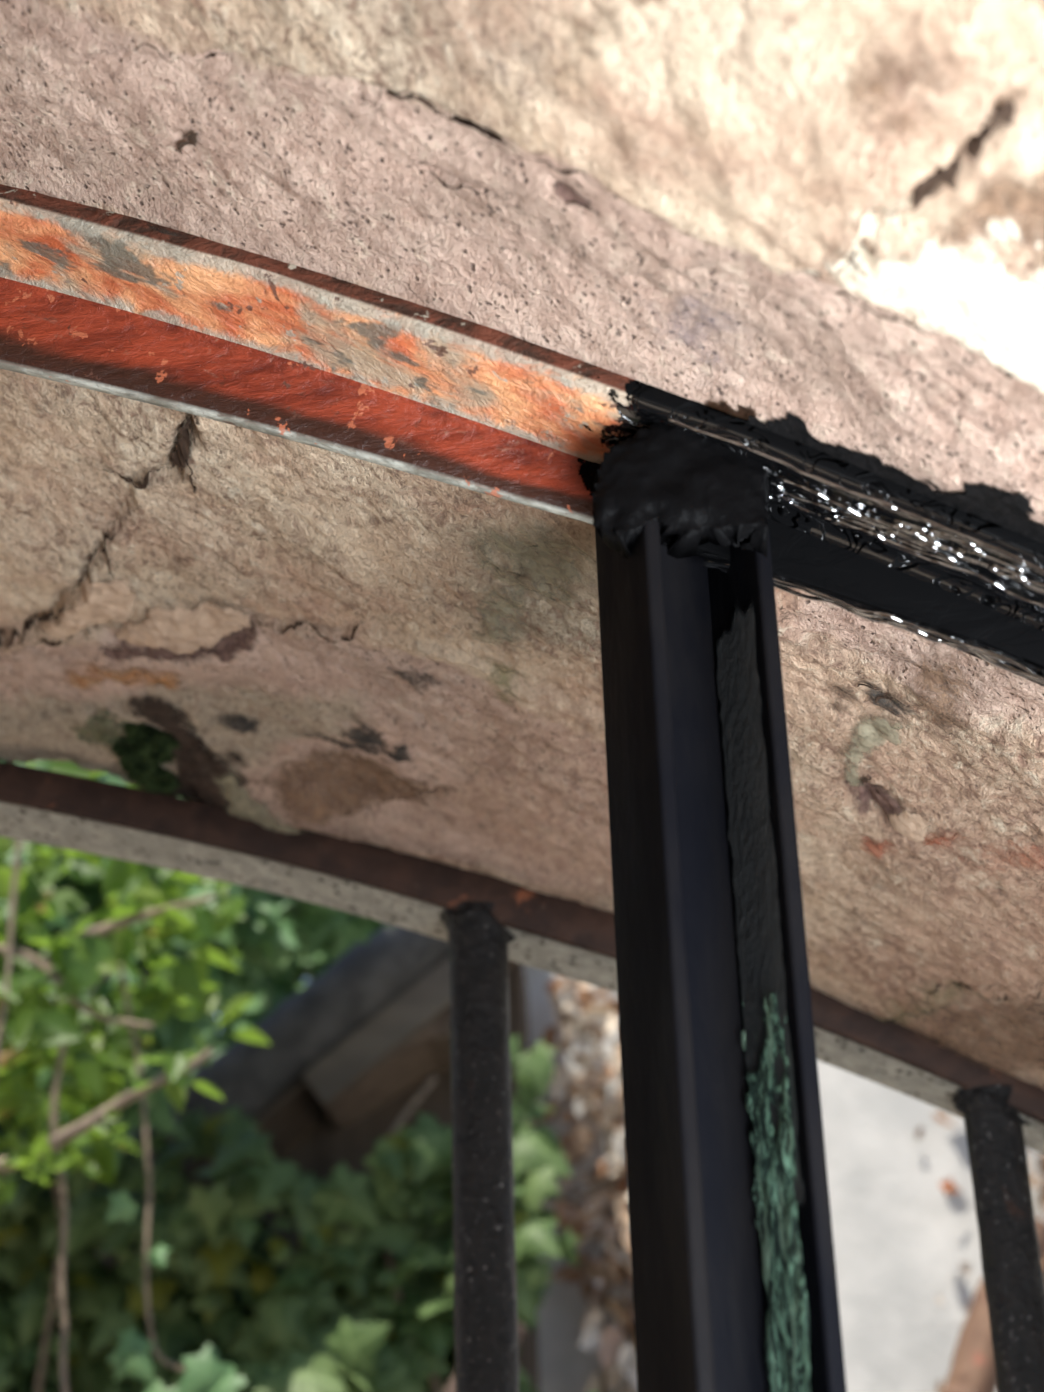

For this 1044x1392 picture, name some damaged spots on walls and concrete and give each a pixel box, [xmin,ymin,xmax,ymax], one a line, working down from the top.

crack [803,97,1016,378]
peeling [829,198,1044,393]
crack [103,418,197,494]
crack [0,521,115,648]
crack [253,614,364,643]